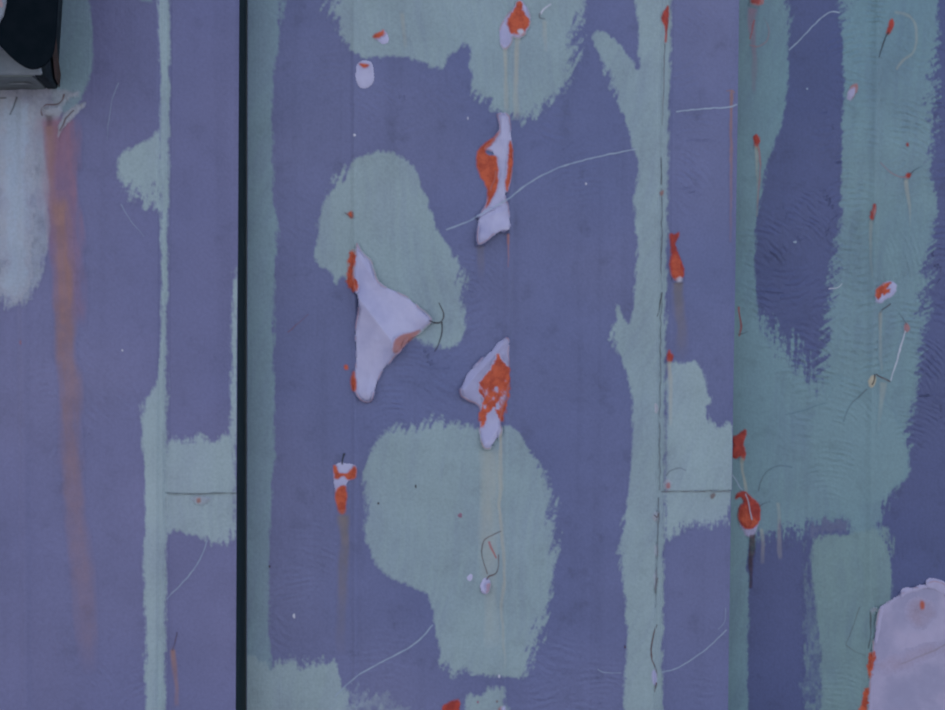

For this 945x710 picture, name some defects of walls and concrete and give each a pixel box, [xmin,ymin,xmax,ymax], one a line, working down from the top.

peeling [474,0,532,282]
rust [32,112,100,675]
peeling [342,242,433,404]
rust [665,231,691,427]
rust [843,203,911,434]
peeling [458,336,513,679]
rust [732,428,771,589]
rust [441,697,462,710]
peeling [857,578,945,710]